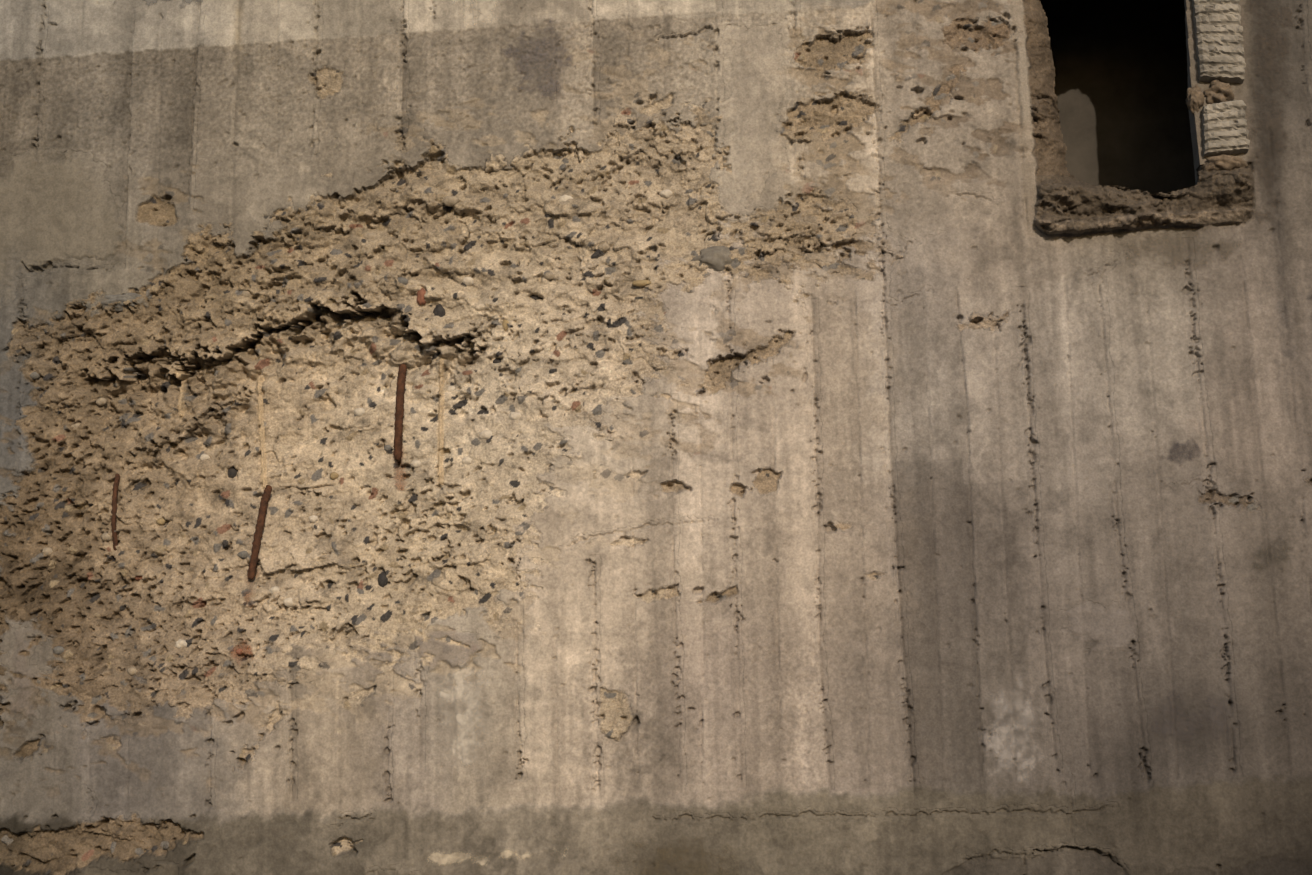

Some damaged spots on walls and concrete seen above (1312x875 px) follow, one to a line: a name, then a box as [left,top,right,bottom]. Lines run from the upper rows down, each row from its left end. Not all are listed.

spalling [781,25,882,143]
spalling [886,16,1023,147]
corrosion [393,364,408,460]
spalling [0,92,905,773]
corrosion [111,474,120,551]
corrosion [247,485,272,580]
spalling [0,812,204,875]
peeling [328,836,363,858]
crack [646,771,1130,875]